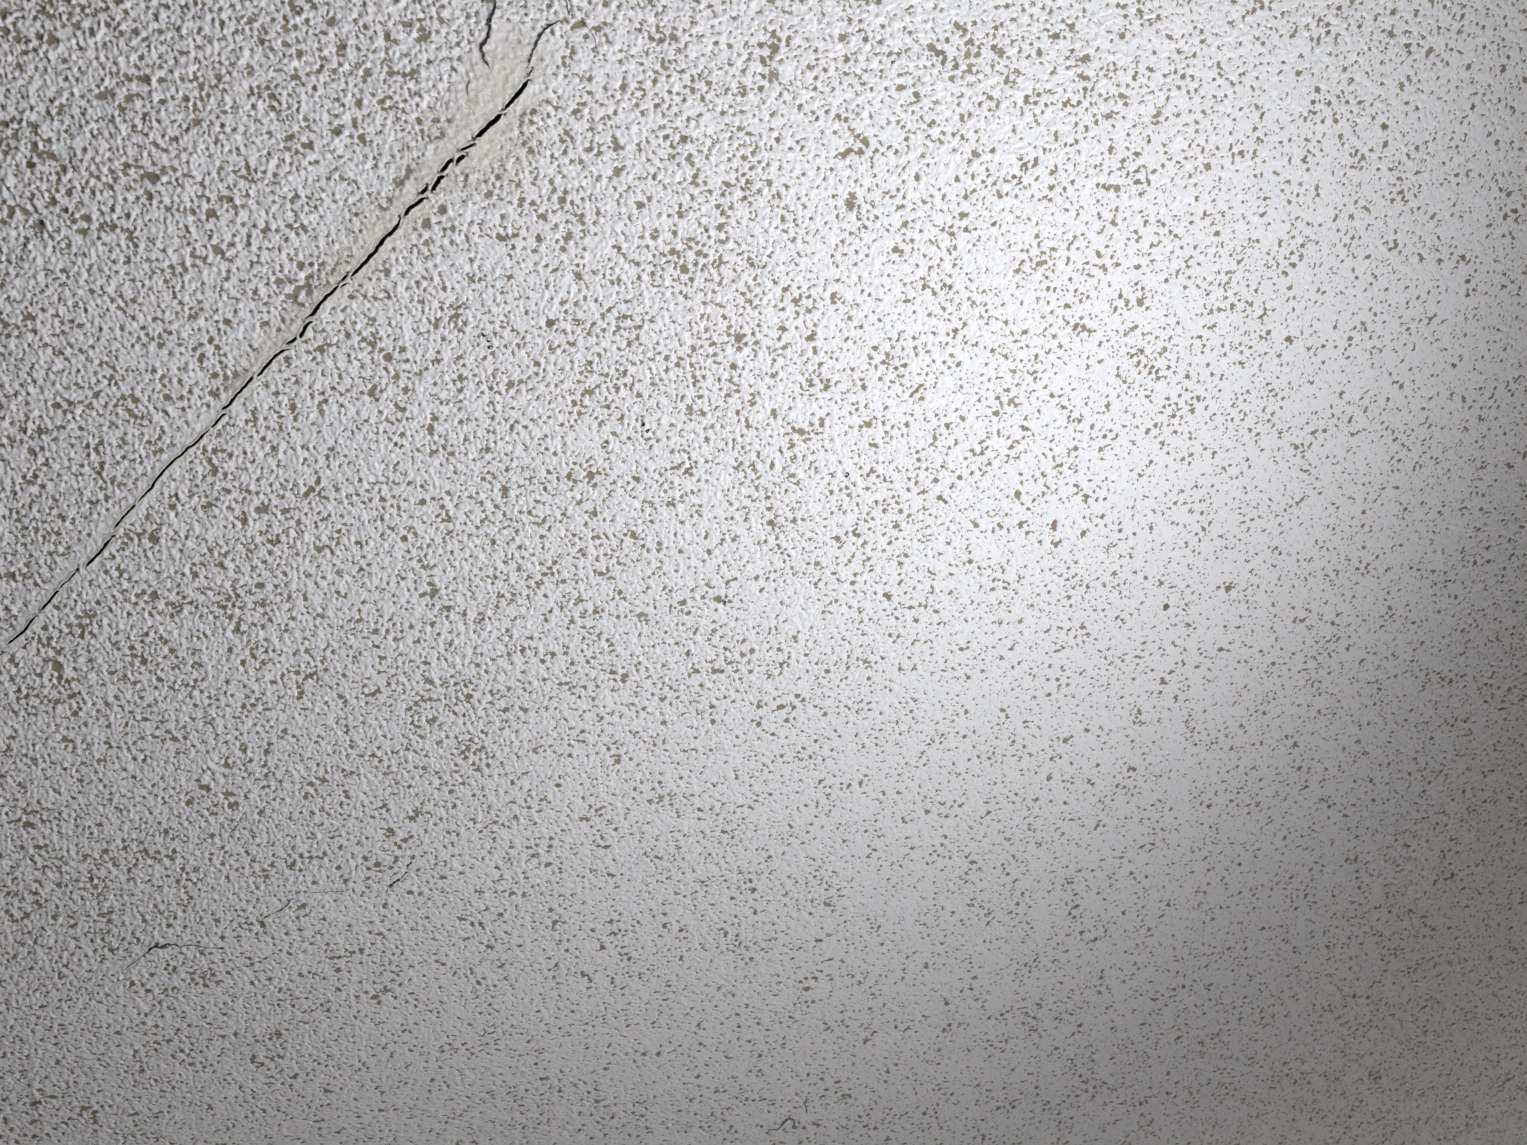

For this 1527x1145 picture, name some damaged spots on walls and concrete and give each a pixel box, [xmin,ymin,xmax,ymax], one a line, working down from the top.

crack [0,0,597,658]